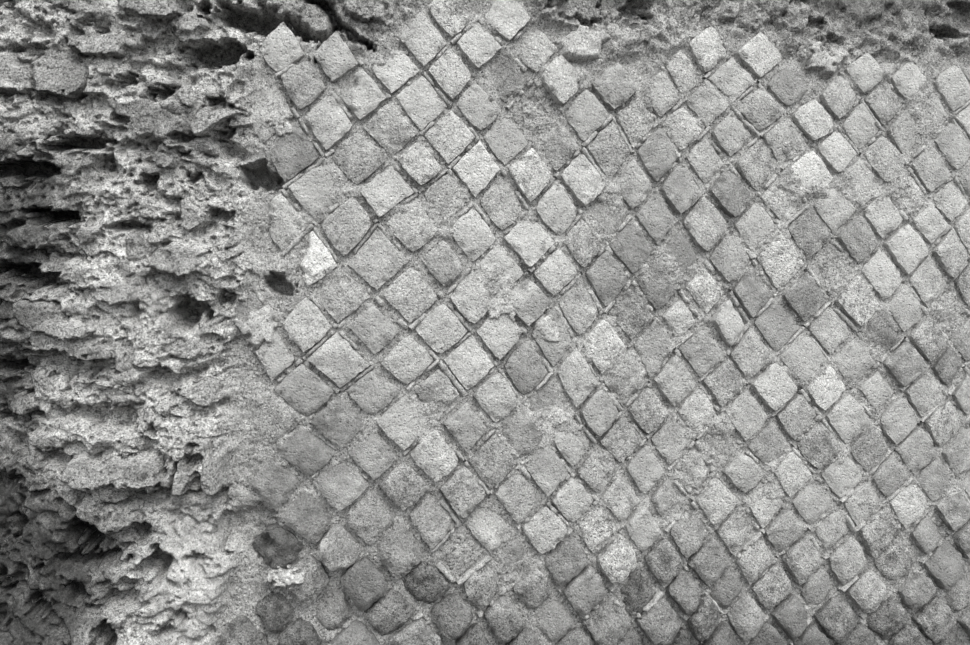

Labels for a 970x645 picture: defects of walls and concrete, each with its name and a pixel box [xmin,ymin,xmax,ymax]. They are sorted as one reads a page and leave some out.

spalling [0,0,423,645]
spalling [526,0,970,65]